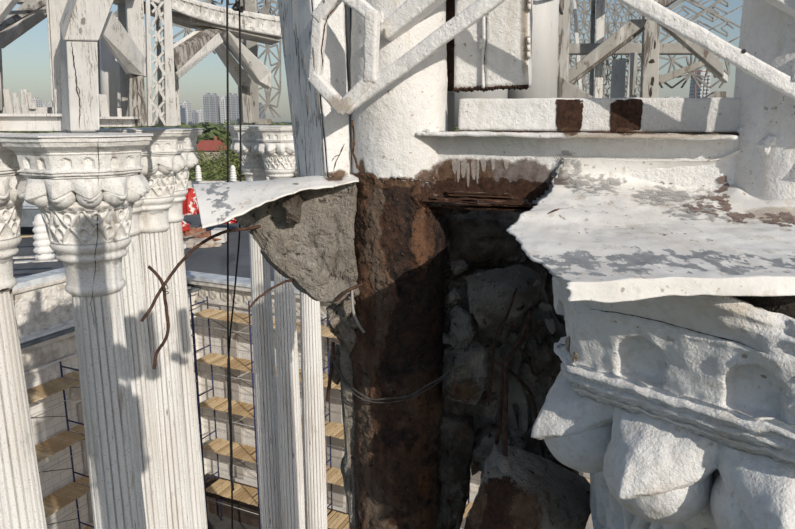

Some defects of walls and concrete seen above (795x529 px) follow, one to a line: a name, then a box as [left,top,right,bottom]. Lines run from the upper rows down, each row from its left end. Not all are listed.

crack [71,43,81,126]
corrosion [555,99,584,136]
corrosion [610,99,643,135]
peeling [551,151,795,227]
crack [90,215,98,328]
spalling [248,279,294,309]
crack [590,309,762,352]
corrosion [464,476,542,529]